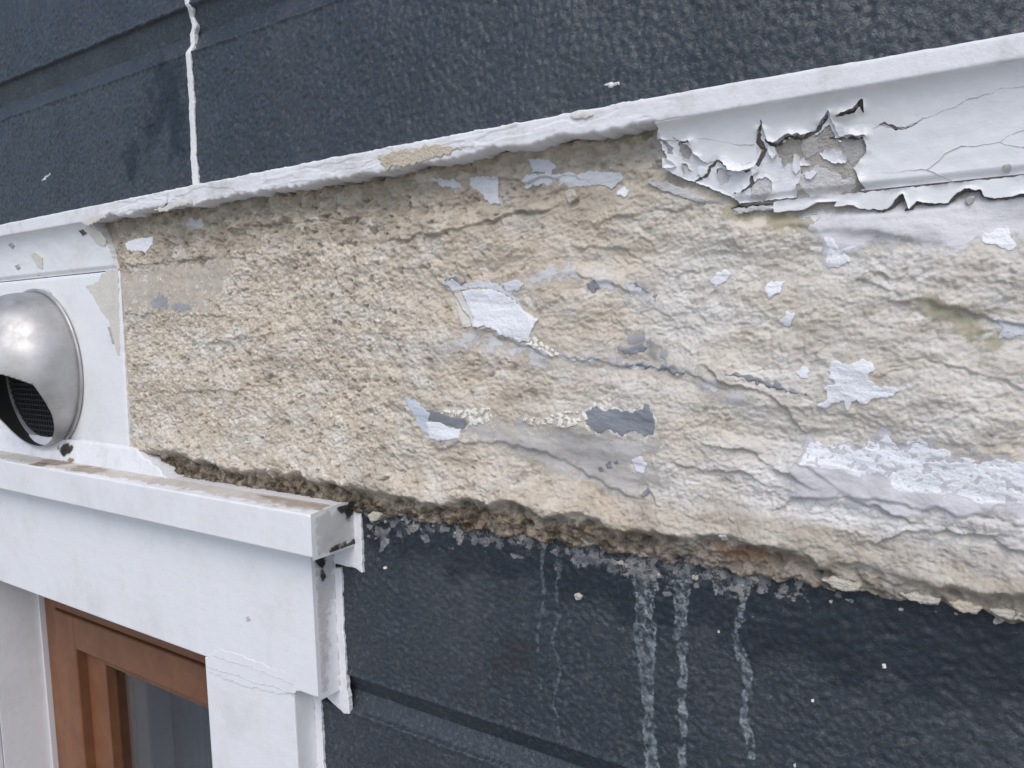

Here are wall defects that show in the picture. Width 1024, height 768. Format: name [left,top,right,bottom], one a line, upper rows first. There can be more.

crack [677,86,1024,213]
spalling [79,124,1024,624]
leakage [536,546,584,733]
leakage [633,567,660,768]
leakage [672,569,691,768]
leakage [733,575,755,760]